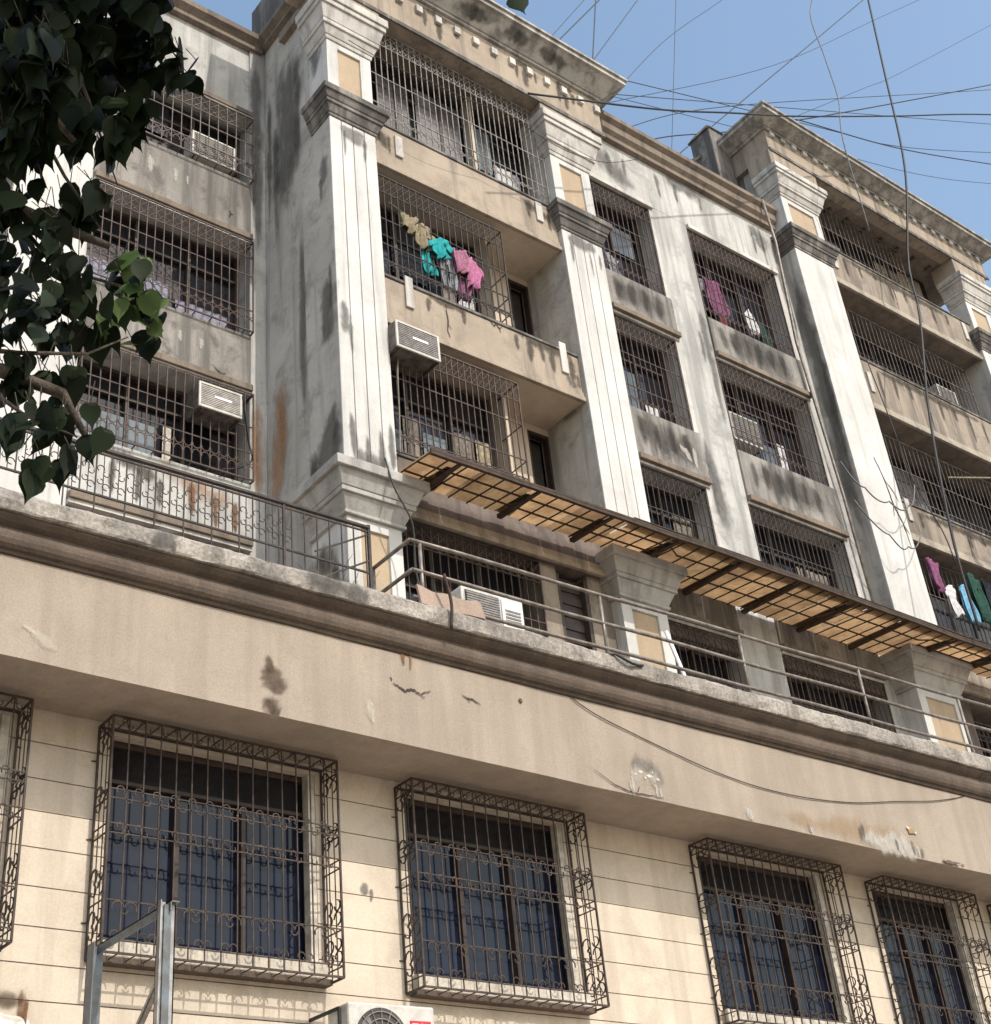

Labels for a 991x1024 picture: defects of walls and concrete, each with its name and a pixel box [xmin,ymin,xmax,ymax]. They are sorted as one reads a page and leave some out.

water stain [251,65,299,239]
water stain [262,656,285,717]
crack [390,676,430,698]
peeling [859,825,924,858]